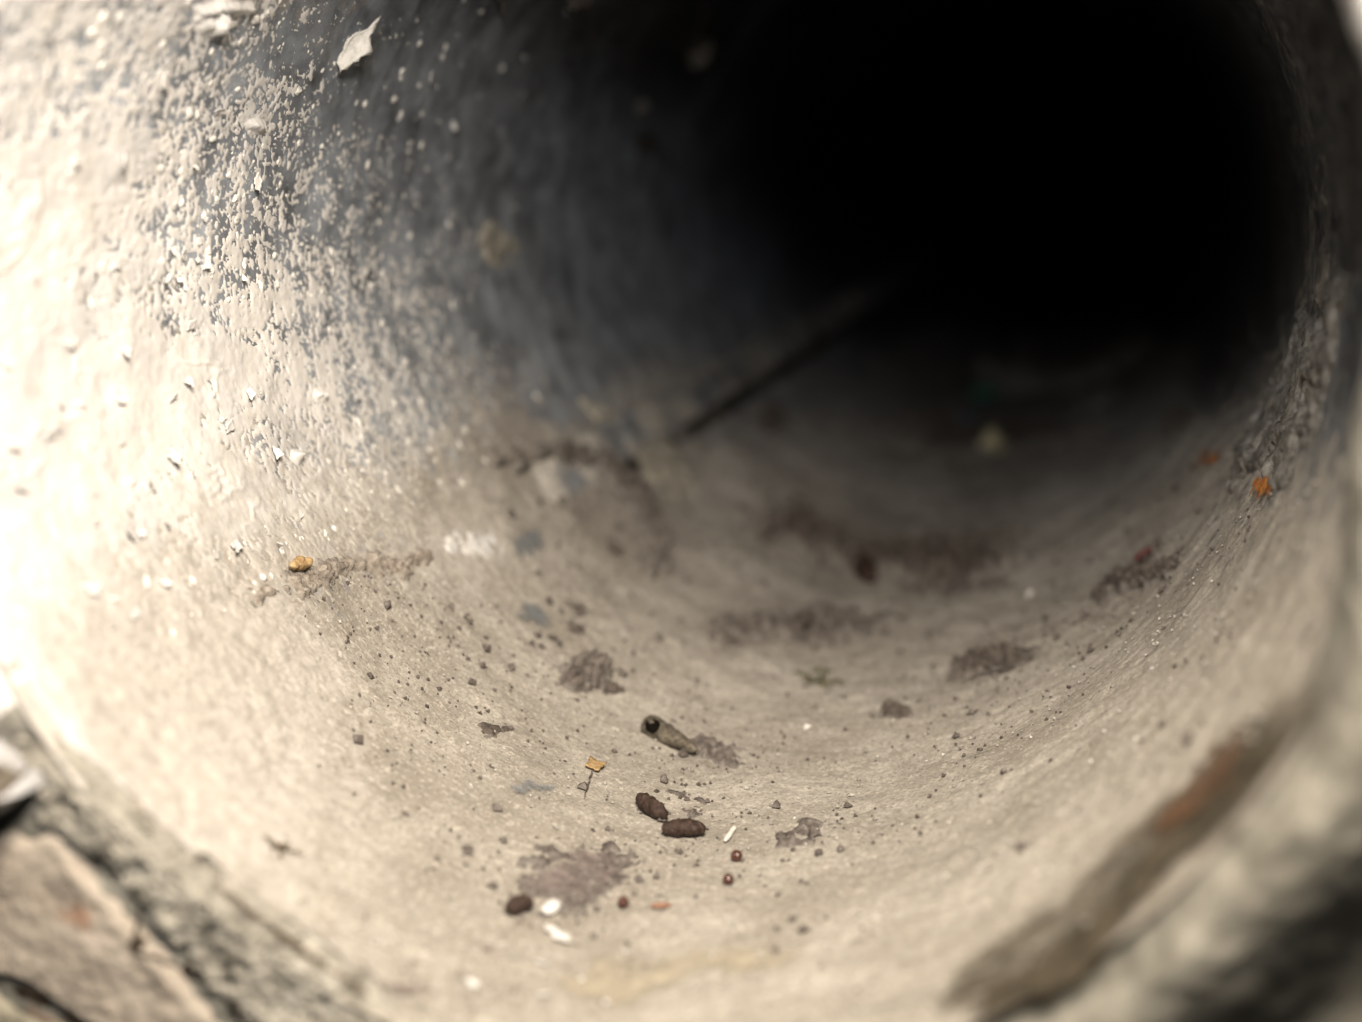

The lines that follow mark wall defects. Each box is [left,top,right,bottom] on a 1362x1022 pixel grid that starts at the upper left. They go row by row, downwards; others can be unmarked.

peeling [0,0,646,945]